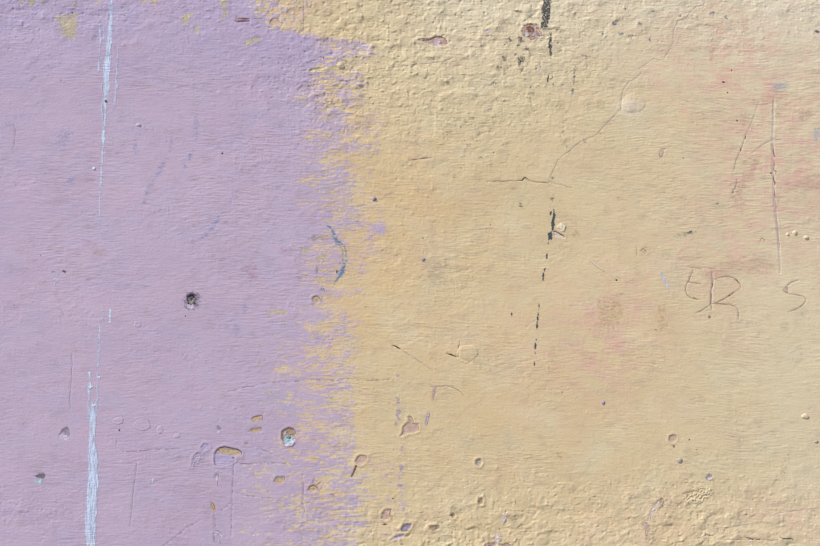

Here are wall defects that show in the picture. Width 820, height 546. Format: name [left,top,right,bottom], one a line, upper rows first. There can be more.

spalling [521,23,544,40]
peeling [418,36,448,46]
crack [492,2,705,188]
flaking render [187,294,197,310]
peeling [214,442,248,483]